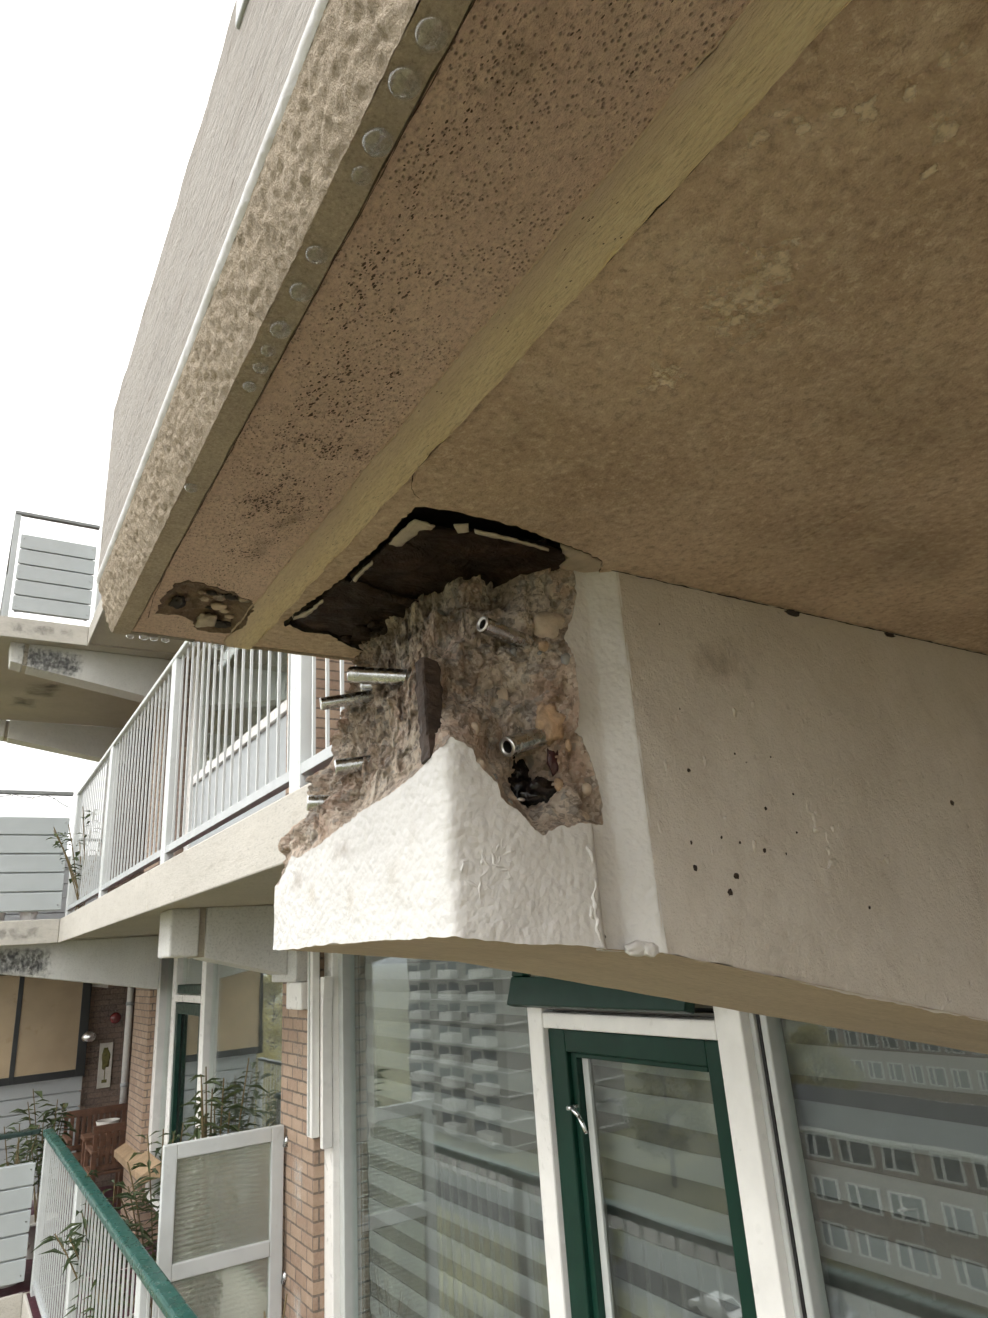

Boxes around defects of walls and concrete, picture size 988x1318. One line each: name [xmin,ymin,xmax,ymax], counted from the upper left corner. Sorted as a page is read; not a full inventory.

spalling [155,44,520,634]
rust [415,657,443,765]
spalling [276,507,603,885]